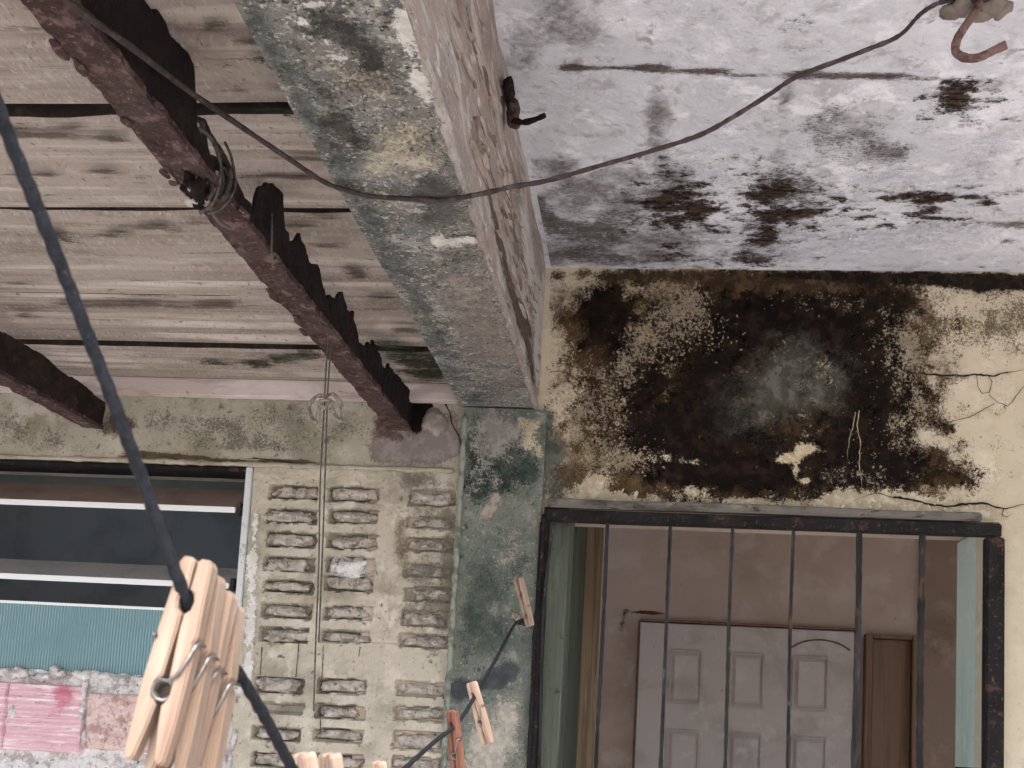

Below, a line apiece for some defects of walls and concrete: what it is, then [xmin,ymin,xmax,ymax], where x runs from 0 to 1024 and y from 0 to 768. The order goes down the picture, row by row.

corrosion [48,38,89,78]
water stain [560,64,768,77]
water stain [785,71,1013,130]
corrosion [159,165,215,211]
corrosion [265,288,324,338]
water stain [518,97,1024,506]
crack [922,370,1022,422]
corrosion [372,416,403,441]
water stain [463,409,528,513]
crack [847,411,1024,517]
water stain [450,663,519,702]